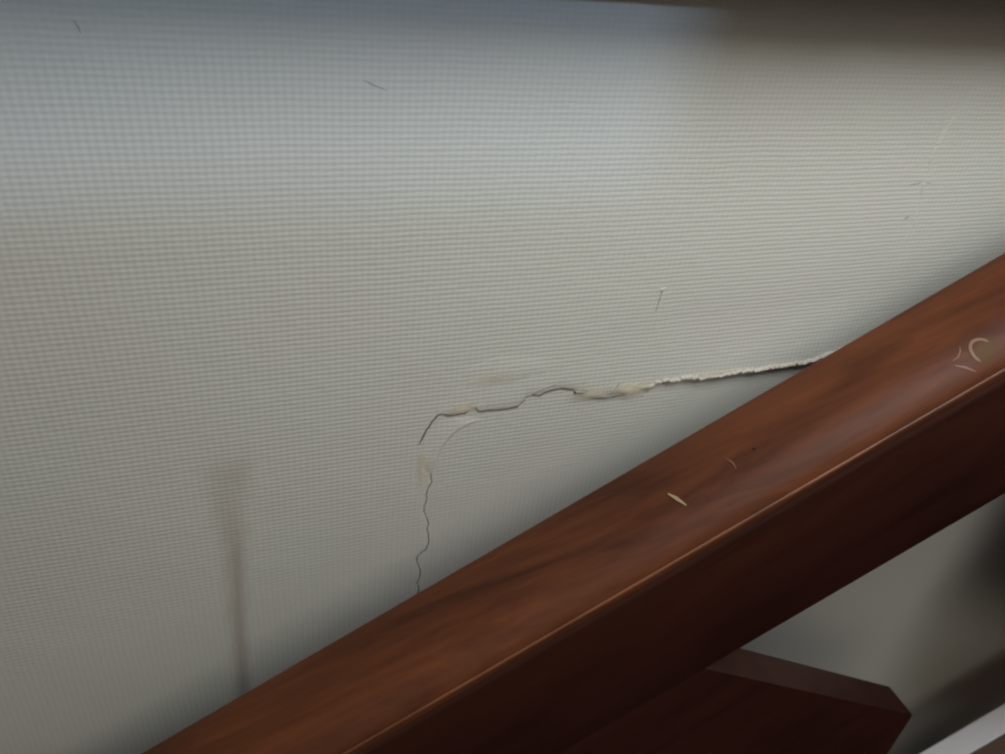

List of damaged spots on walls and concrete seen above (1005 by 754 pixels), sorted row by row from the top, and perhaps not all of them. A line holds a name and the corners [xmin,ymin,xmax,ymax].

crack [387,382,663,608]